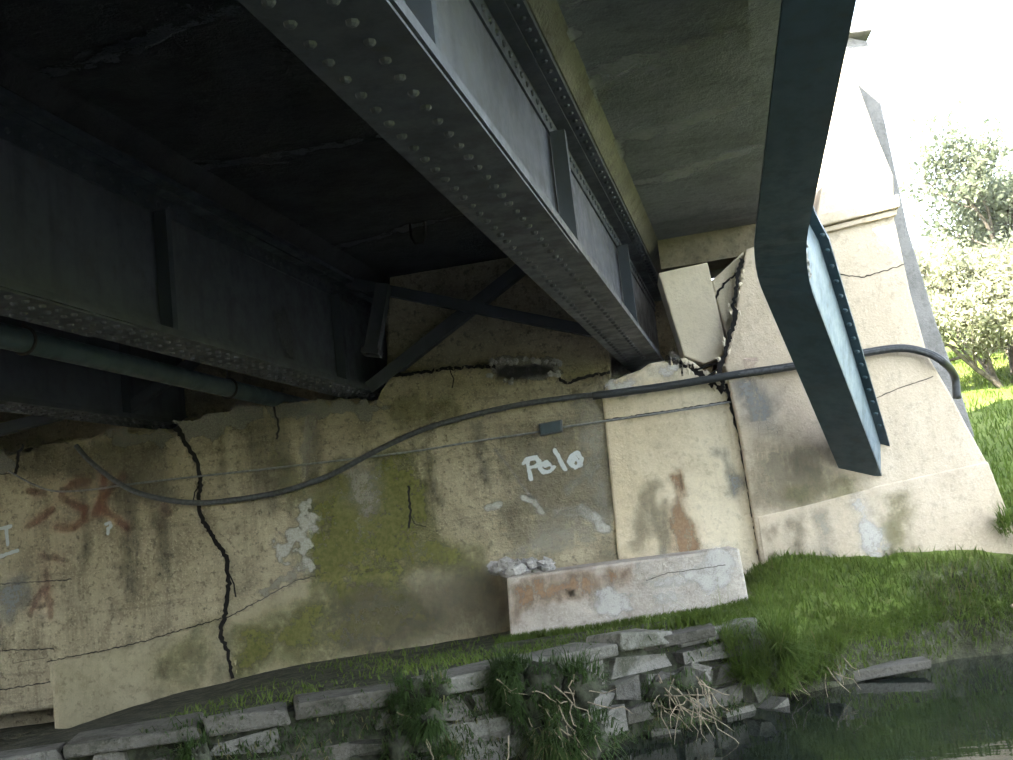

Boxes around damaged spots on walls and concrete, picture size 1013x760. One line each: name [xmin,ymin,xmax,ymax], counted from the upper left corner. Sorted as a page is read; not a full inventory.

crack [383,364,496,388]
crack [554,371,610,384]
crack [605,258,760,564]
crack [0,426,327,690]
water stain [259,498,319,596]
corrosion [662,472,700,552]